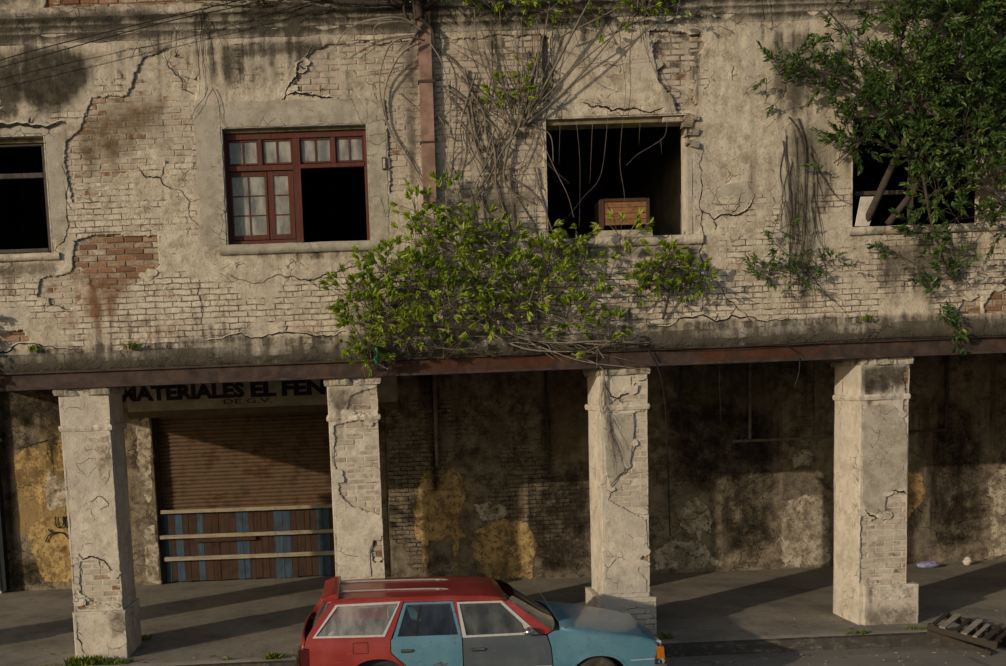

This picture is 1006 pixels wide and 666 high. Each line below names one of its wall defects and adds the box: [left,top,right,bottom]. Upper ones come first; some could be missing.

water stain [3,53,87,110]
flaking render [64,48,199,203]
peeling [559,27,704,149]
flaking render [36,234,160,310]
crack [138,167,200,227]
crack [646,149,785,327]
water stain [0,390,61,463]
flaking render [331,389,383,578]
water stain [670,400,774,549]
water stain [866,366,907,404]
peeling [860,369,926,585]
water stain [932,403,981,545]